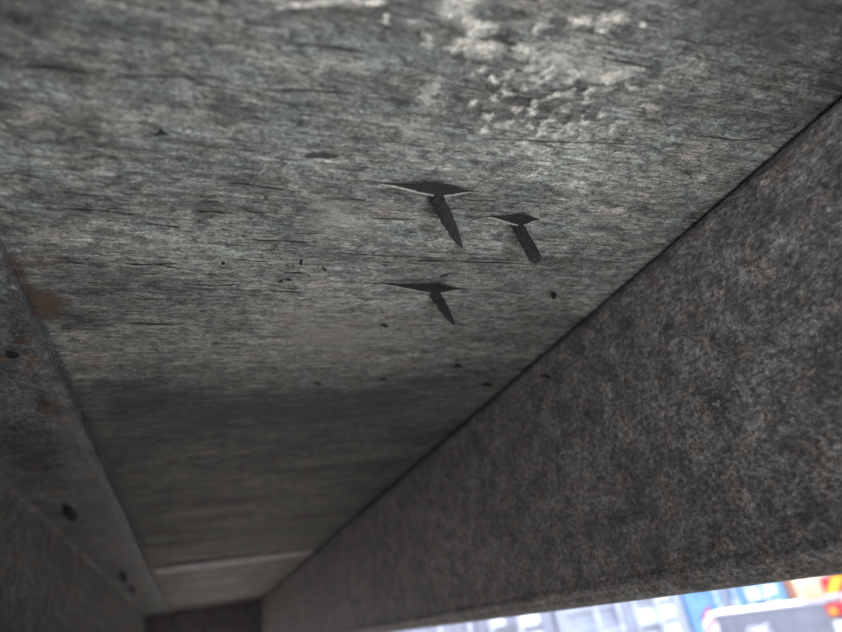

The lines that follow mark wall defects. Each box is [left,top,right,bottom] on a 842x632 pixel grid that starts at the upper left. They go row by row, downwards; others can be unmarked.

leakage [568,12,623,33]
leakage [440,0,586,78]
leakage [595,64,644,90]